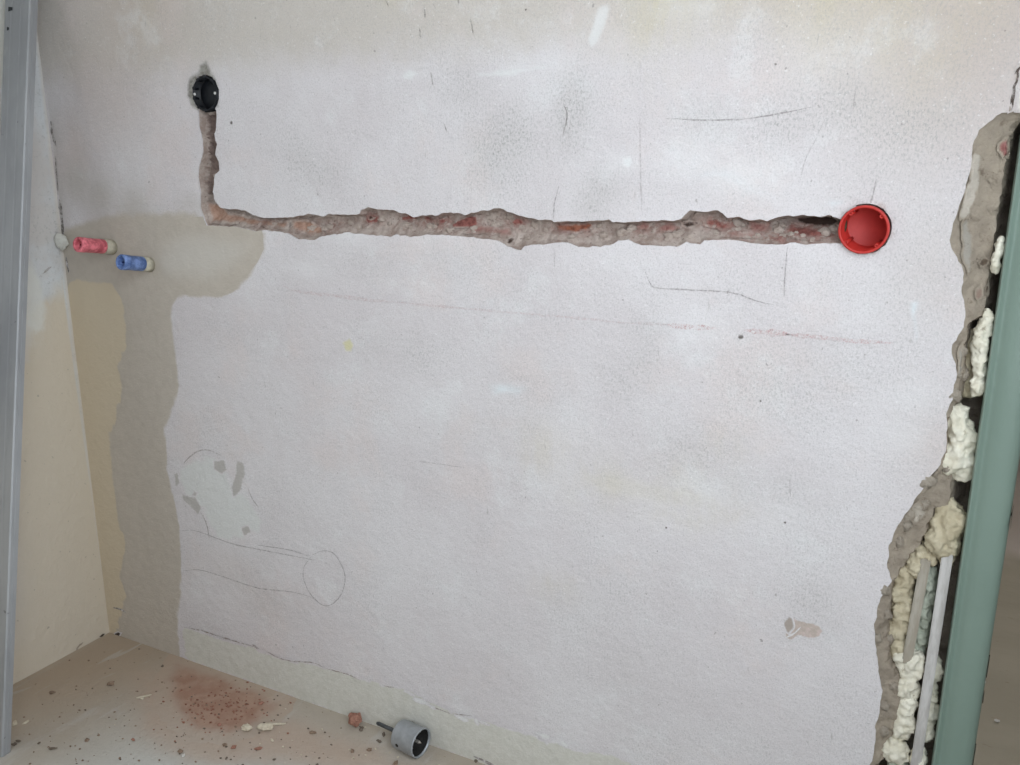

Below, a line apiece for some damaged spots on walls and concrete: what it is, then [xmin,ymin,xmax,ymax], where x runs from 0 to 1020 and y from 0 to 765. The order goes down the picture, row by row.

spalling [870,111,1020,765]